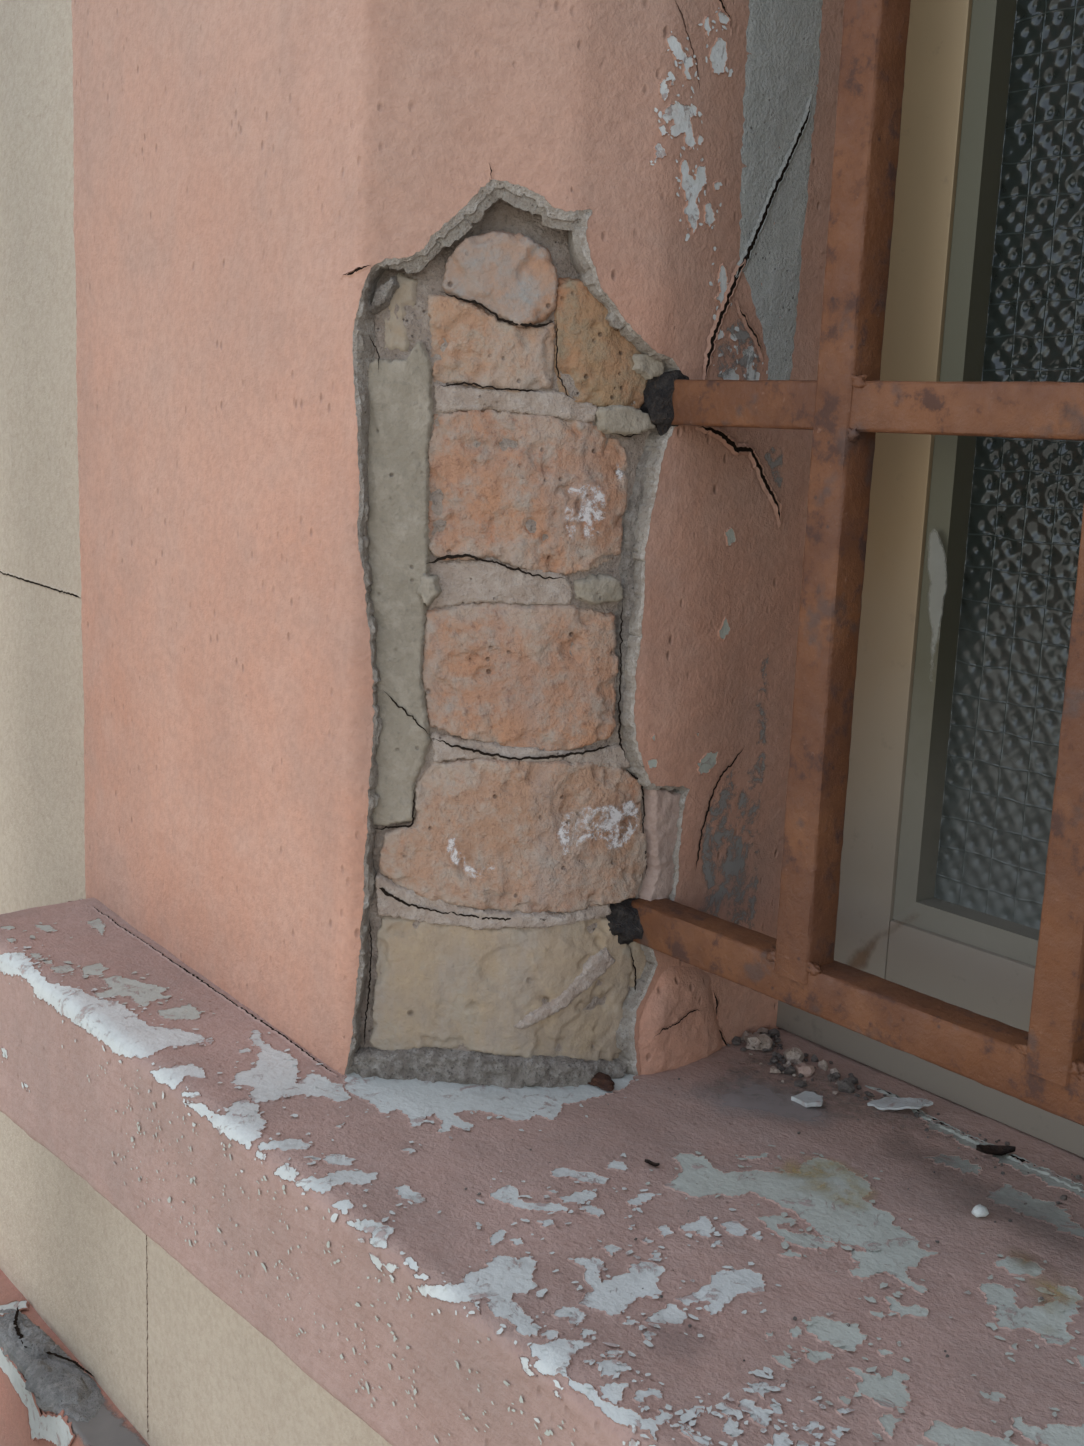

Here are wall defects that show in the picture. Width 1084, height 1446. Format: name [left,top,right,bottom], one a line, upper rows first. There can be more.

flaking render [650,0,823,380]
crack [702,94,813,380]
crack [695,426,782,528]
spalling [0,179,940,1446]
crack [696,744,746,868]
crack [865,1085,1084,1192]
peeling [918,1111,1084,1239]
peeling [963,1253,1084,1384]
peeling [917,1374,1084,1446]